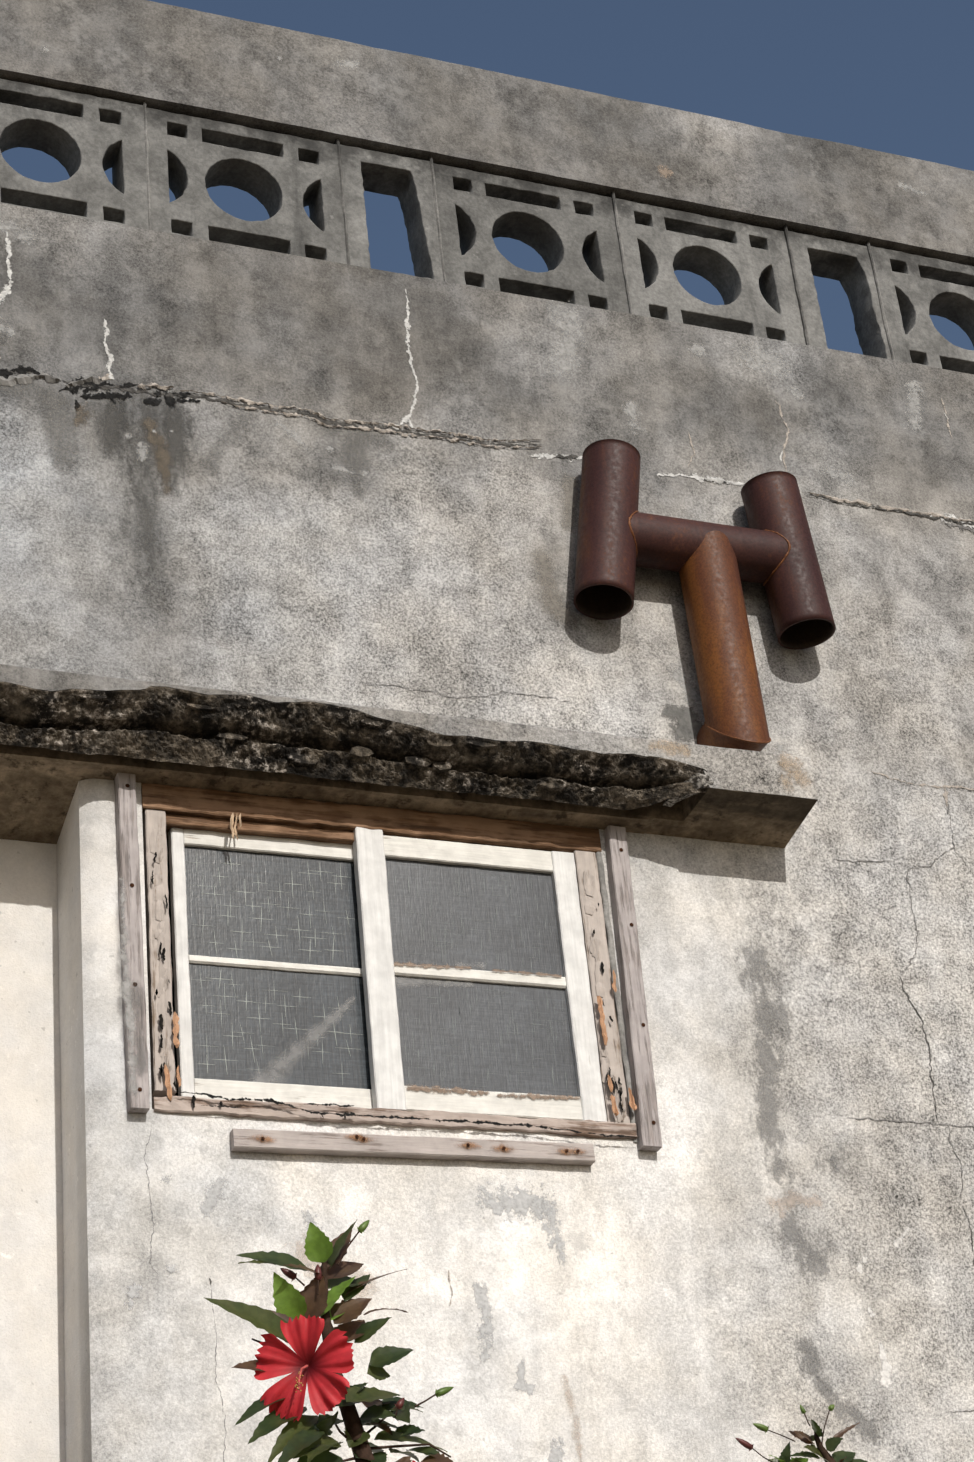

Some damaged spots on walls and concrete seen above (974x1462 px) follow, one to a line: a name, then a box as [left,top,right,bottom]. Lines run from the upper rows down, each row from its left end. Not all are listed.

crack [0,231,14,305]
crack [0,289,582,462]
crack [657,430,744,485]
crack [775,401,974,532]
spalling [0,682,714,810]
crack [832,771,974,1264]